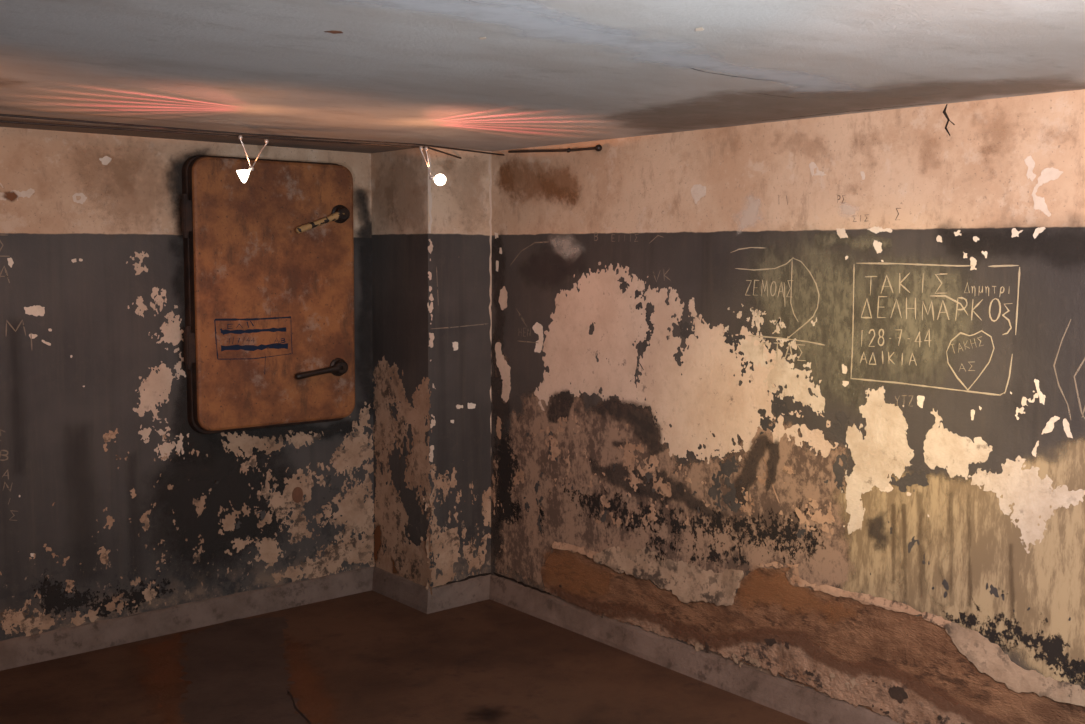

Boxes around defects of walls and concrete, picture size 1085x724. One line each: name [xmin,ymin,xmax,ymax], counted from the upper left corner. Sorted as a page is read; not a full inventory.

crack [684,66,955,136]
water stain [501,163,576,203]
peeling [126,251,149,275]
peeling [24,305,45,316]
peeling [128,287,208,461]
peeling [103,428,129,469]
water stain [595,399,662,454]
peeling [172,262,1085,724]
peeling [0,503,166,636]
water stain [563,435,1085,688]
water stain [551,587,1008,724]